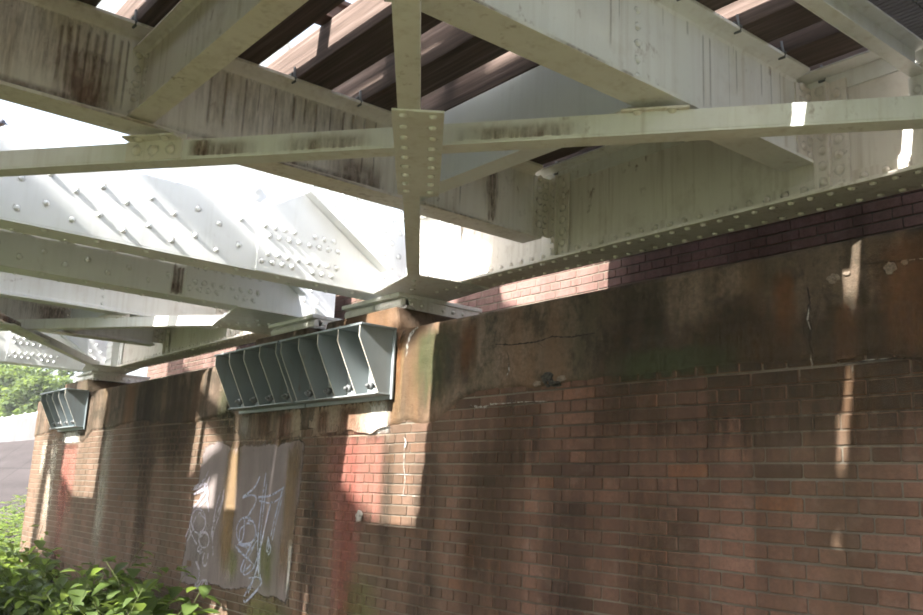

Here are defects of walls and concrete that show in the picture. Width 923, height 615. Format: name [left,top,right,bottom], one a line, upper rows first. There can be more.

crack [803,287,813,365]